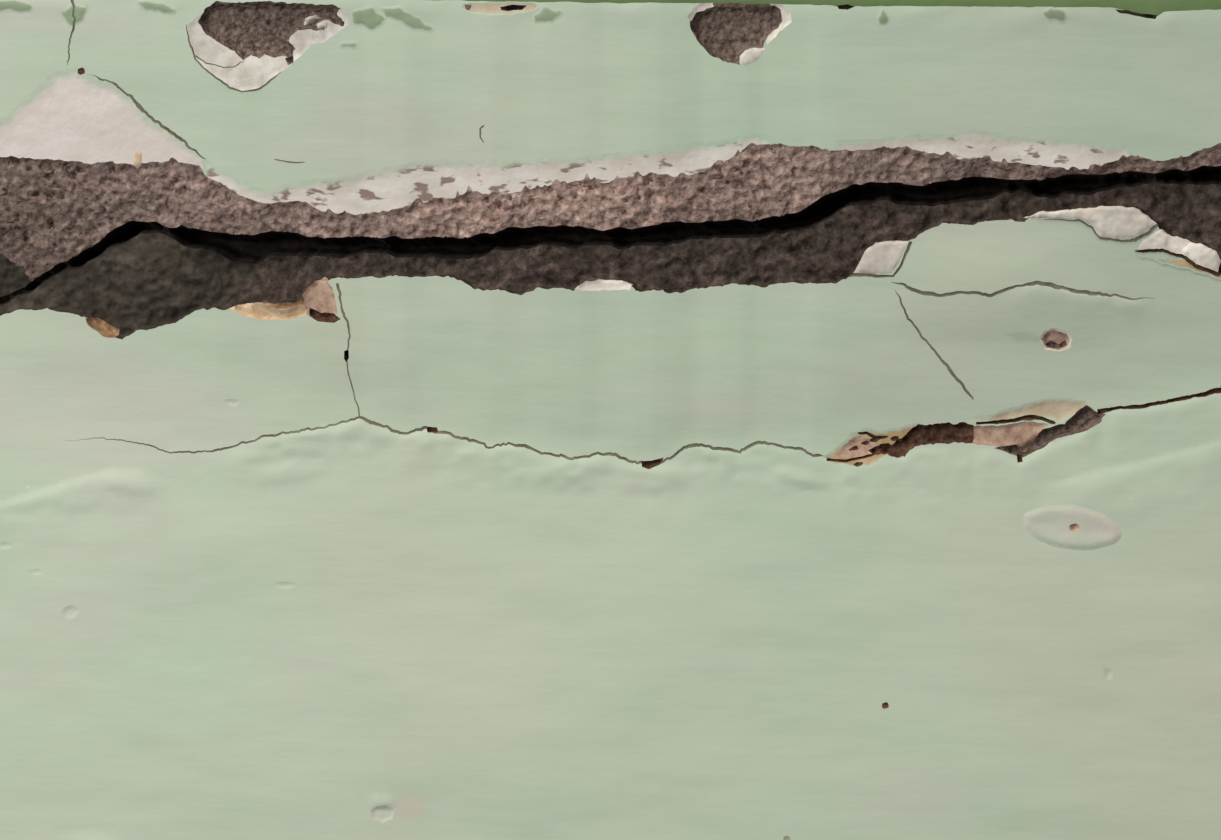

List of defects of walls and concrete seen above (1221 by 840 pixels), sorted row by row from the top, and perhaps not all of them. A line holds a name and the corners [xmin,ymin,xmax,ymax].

spalling [186,1,350,93]
spalling [687,3,792,65]
peeling [0,68,774,215]
peeling [834,129,1135,170]
crack [0,0,1221,469]
peeling [853,241,909,275]
peeling [1024,206,1221,280]
peeling [1039,328,1073,351]